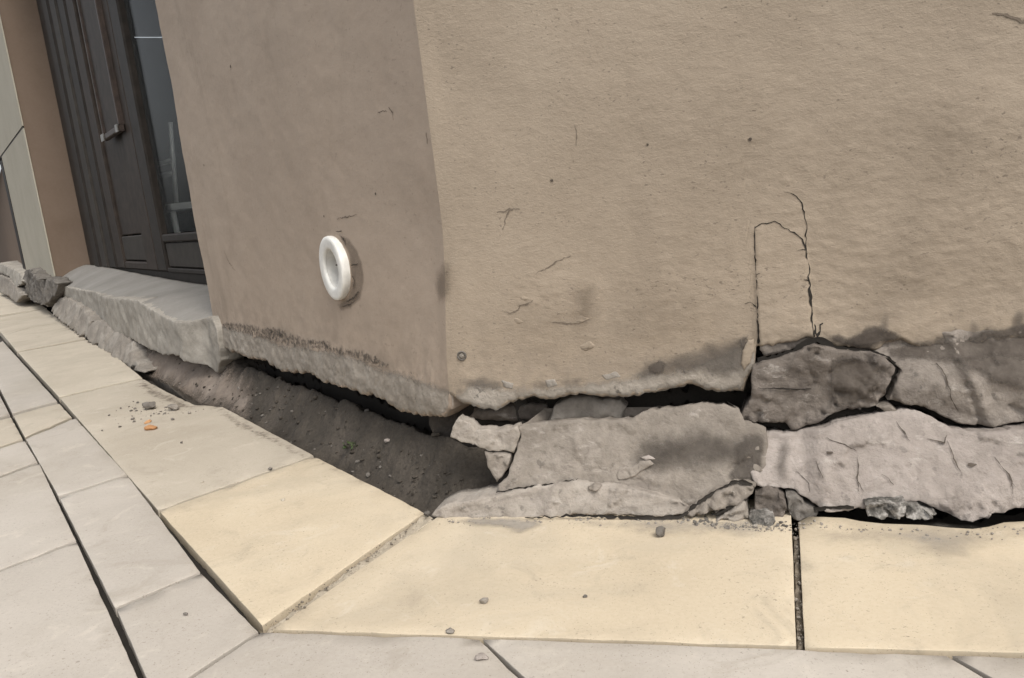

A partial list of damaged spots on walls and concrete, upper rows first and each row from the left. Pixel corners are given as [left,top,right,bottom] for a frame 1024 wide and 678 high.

crack [254,362,431,432]
peeling [222,327,755,482]
crack [456,397,564,426]
leakage [647,337,747,373]
crack [624,192,1024,529]
leakage [832,315,1024,389]
spalling [868,329,1024,428]
peeling [685,436,763,522]